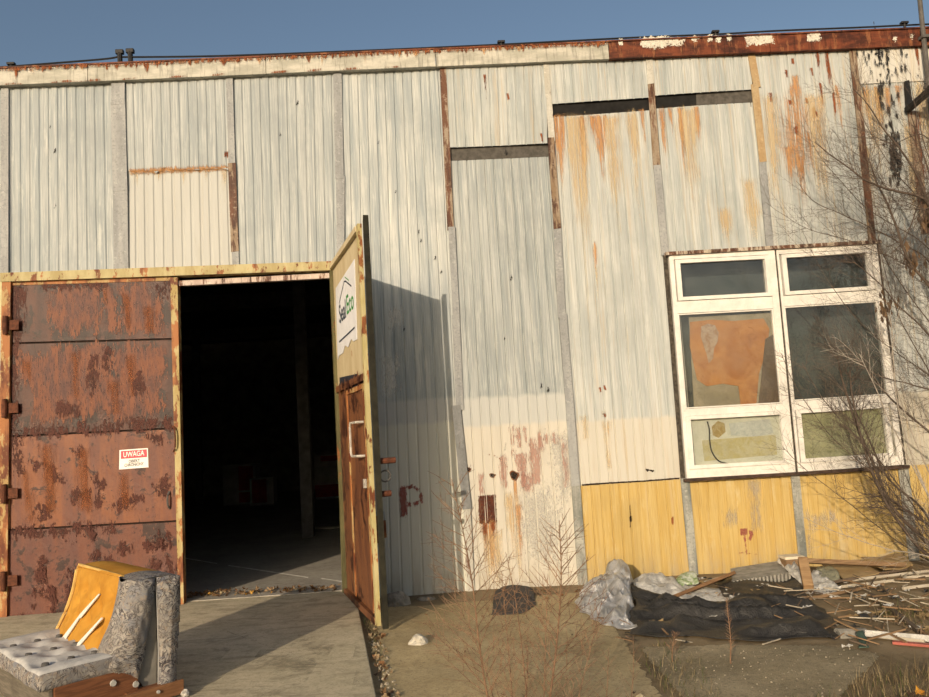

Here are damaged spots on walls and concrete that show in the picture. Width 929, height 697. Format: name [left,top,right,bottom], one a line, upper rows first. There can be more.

peeling [640,33,732,50]
peeling [744,33,775,47]
rust [130,152,228,178]
rust [554,115,618,211]
rust [659,107,700,169]
rust [765,52,842,195]
rust [40,283,109,292]
rust [10,285,174,450]
rust [9,520,117,541]
rust [478,481,522,570]